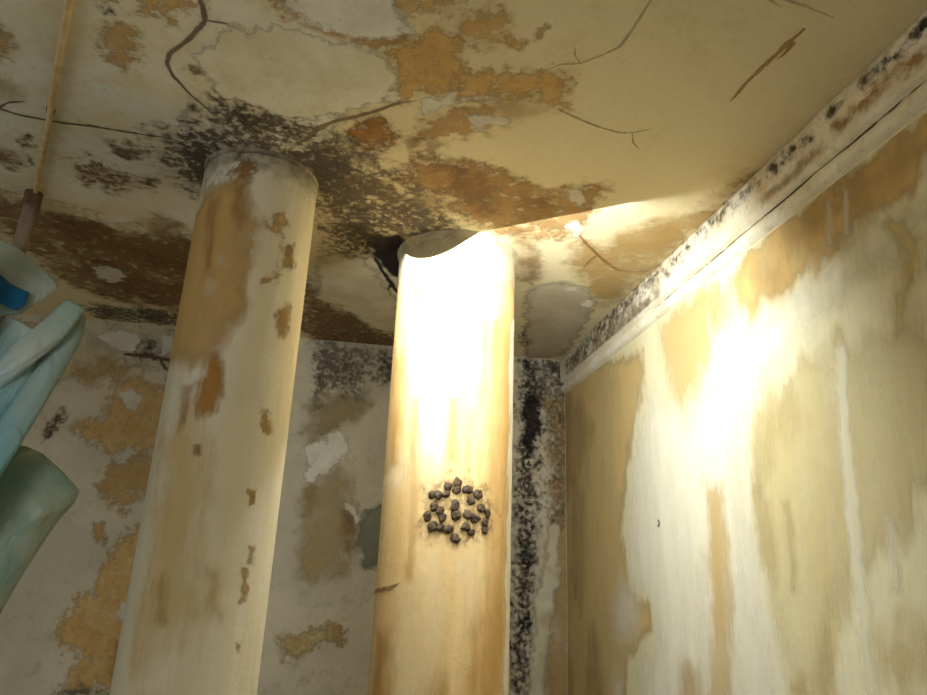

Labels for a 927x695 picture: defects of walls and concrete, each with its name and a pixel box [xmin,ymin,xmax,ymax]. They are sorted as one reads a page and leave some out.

crack [0,101,187,143]
crack [165,0,230,117]
peeling [0,0,577,239]
crack [730,28,806,102]
damp [28,95,610,367]
crack [373,258,398,293]
peeling [564,221,585,237]
damp [694,84,927,331]
flaking render [303,431,350,483]
damp [415,273,491,544]
damp [503,179,760,695]
peeling [278,621,347,662]